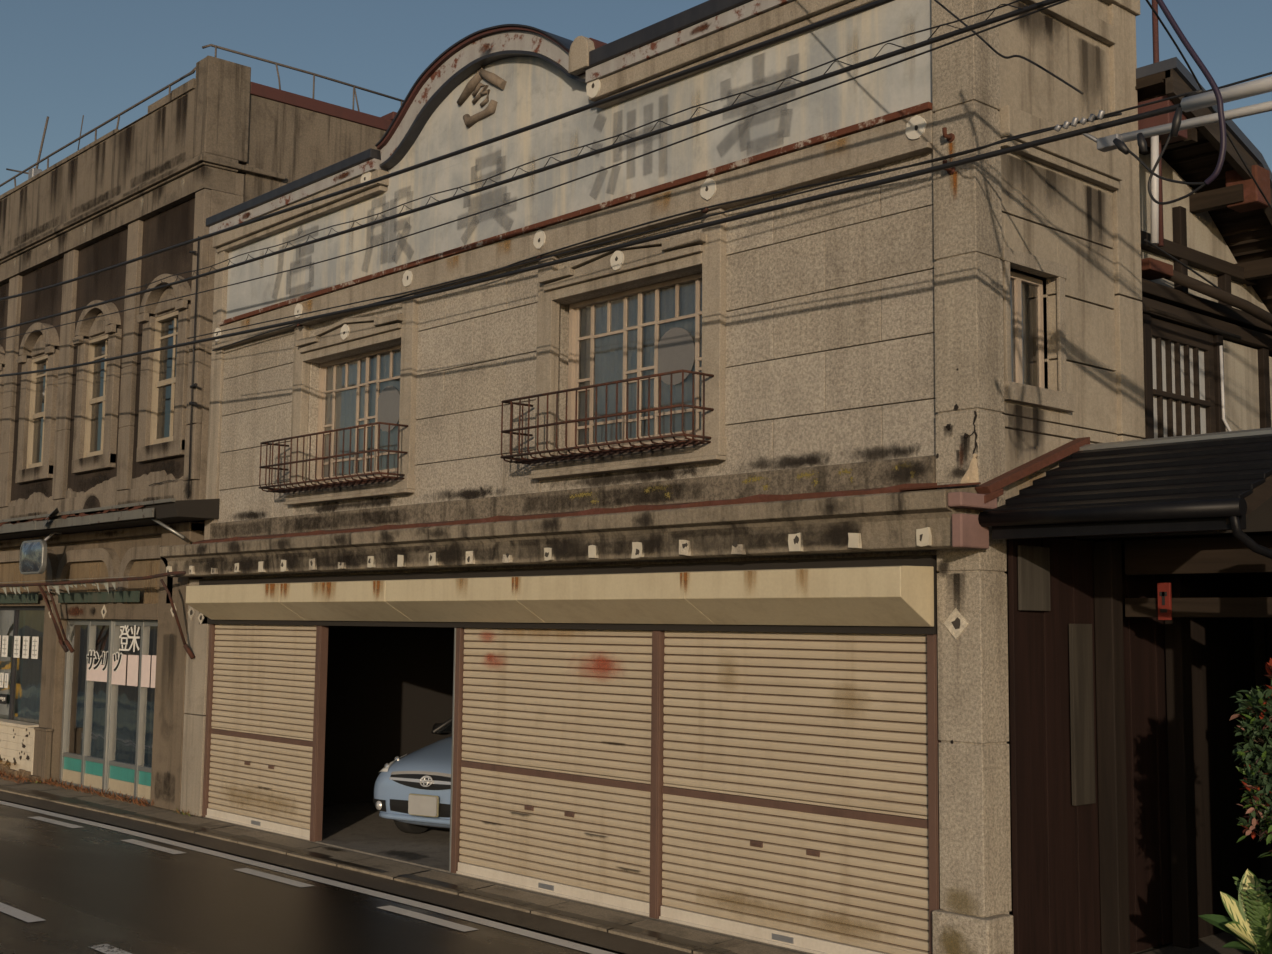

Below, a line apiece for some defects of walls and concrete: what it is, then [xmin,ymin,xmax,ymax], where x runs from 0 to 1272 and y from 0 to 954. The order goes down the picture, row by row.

crack [969,411,978,464]
damp [756,456,819,468]
spalling [959,453,979,487]
damp [318,497,419,566]
damp [445,488,490,499]
damp [534,519,575,556]
damp [577,467,711,551]
damp [826,503,852,544]
peeling [0,729,30,766]